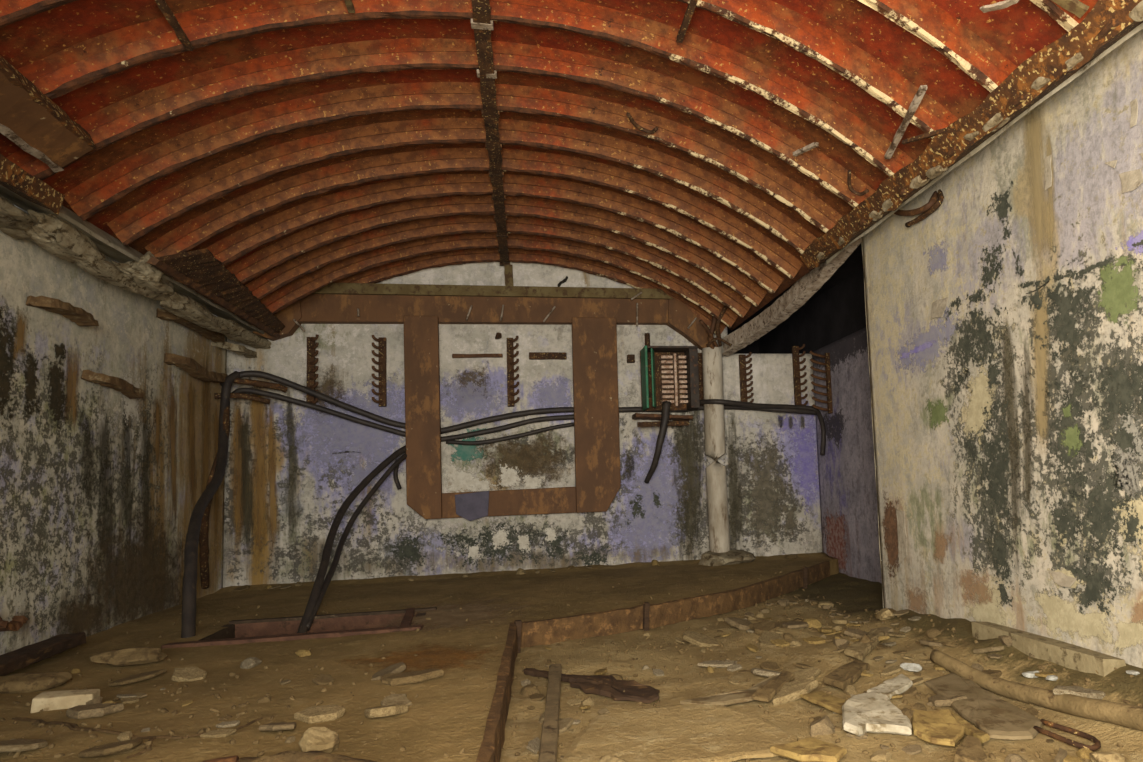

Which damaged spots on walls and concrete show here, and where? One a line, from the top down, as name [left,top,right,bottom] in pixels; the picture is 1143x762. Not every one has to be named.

leakage [1026,113,1054,254]
leakage [0,295,184,637]
corrosion [154,361,279,549]
leakage [239,417,253,547]
leakage [286,402,297,531]
leakage [458,367,489,399]
mould [384,518,611,571]
leakage [477,430,572,489]
leakage [623,454,634,478]
leakage [624,490,661,531]
leakage [674,410,701,556]
leakage [943,181,1143,626]